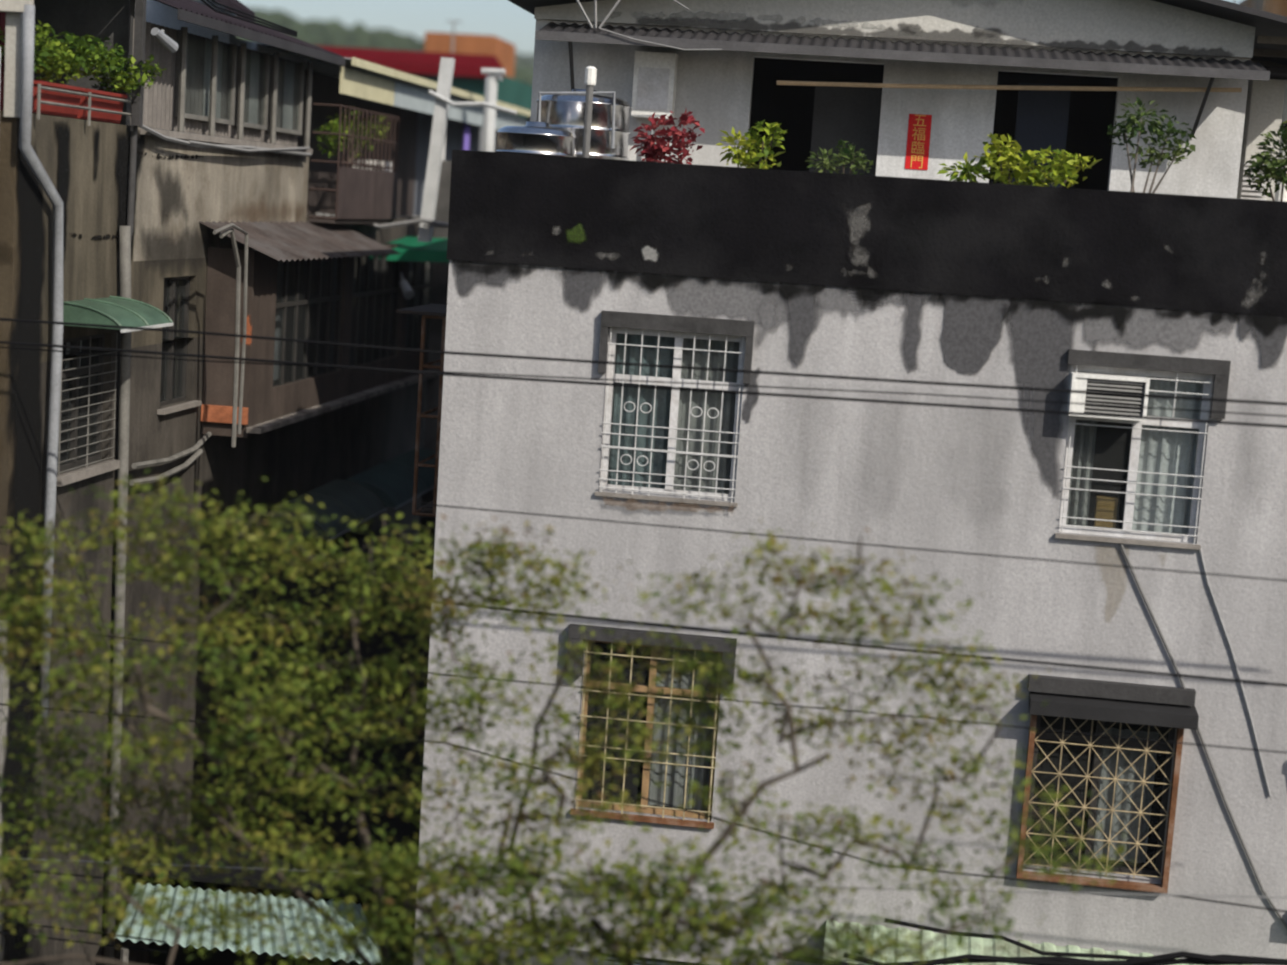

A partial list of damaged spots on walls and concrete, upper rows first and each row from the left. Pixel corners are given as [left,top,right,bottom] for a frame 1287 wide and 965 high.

damp [115,131,212,271]
peeling [849,205,874,277]
peeling [1242,281,1262,306]
damp [563,267,1287,495]